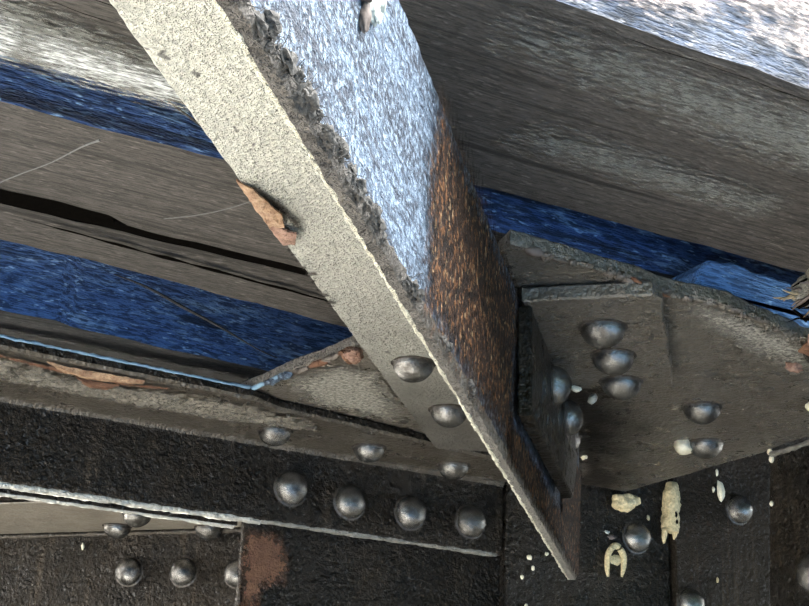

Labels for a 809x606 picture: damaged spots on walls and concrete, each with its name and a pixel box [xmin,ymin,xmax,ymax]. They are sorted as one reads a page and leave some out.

crack [0,189,328,301]
peeling [236,179,336,307]
peeling [0,355,169,390]
rust [241,530,288,606]